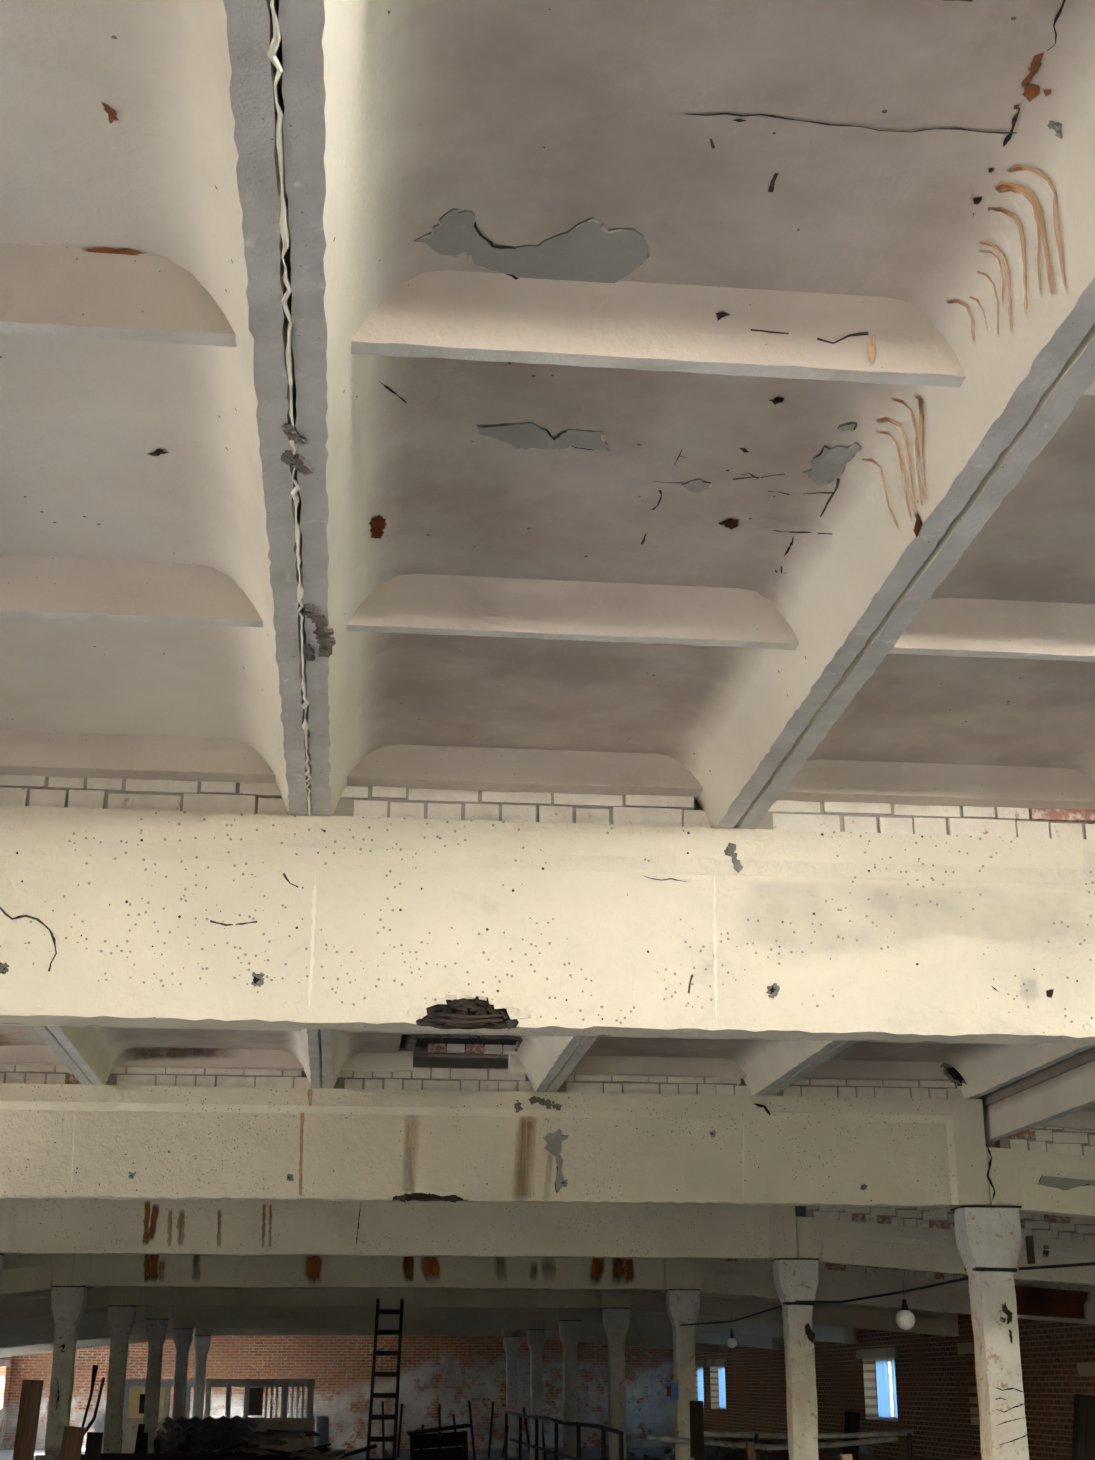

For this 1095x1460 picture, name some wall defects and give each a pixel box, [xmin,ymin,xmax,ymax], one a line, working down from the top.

corrosion [1003,0,1066,146]
crack [687,113,1063,148]
peeling [414,208,650,283]
corrosion [950,165,1066,339]
peeling [477,422,610,451]
peeling [802,422,862,486]
corrosion [865,396,927,537]
crack [0,907,57,971]
spalling [406,991,531,1030]
peeling [514,1096,562,1113]
peeling [543,1129,569,1193]
crack [986,1144,995,1204]